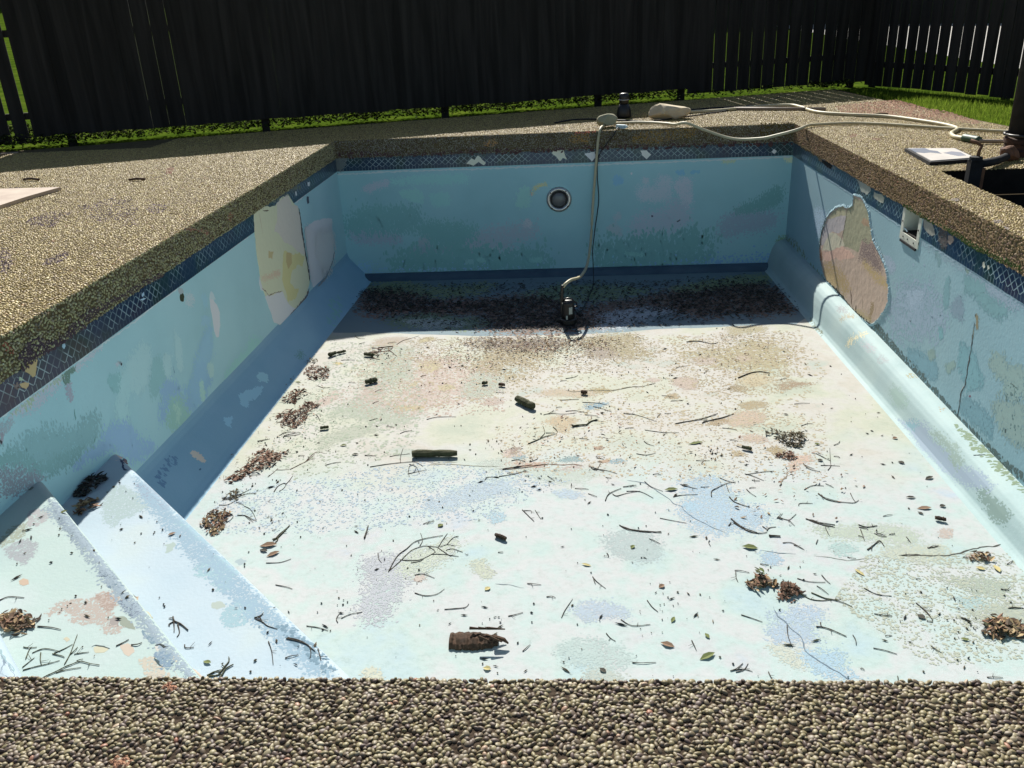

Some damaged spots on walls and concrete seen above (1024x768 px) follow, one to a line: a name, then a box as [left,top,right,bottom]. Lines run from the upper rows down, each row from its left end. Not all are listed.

spalling [254,182,310,325]
spalling [812,180,891,327]
crack [957,323,975,417]